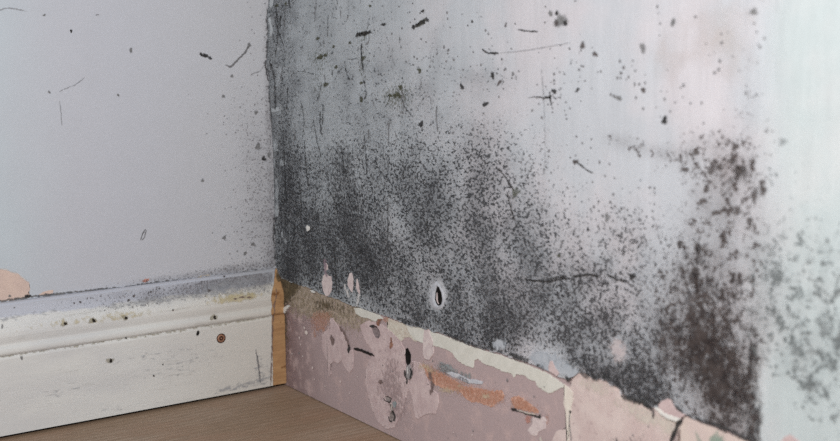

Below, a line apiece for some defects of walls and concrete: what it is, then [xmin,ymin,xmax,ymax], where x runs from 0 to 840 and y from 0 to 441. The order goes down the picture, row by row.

water stain [548,11,567,26]
water stain [342,5,385,72]
water stain [307,35,354,107]
peeling [0,268,53,301]
water stain [0,287,118,302]
peeling [310,259,333,296]
peeling [344,273,360,307]
peeling [370,318,417,342]
peeling [611,339,626,361]
peeling [439,362,484,385]
spalling [383,396,397,422]
peeling [654,399,686,422]